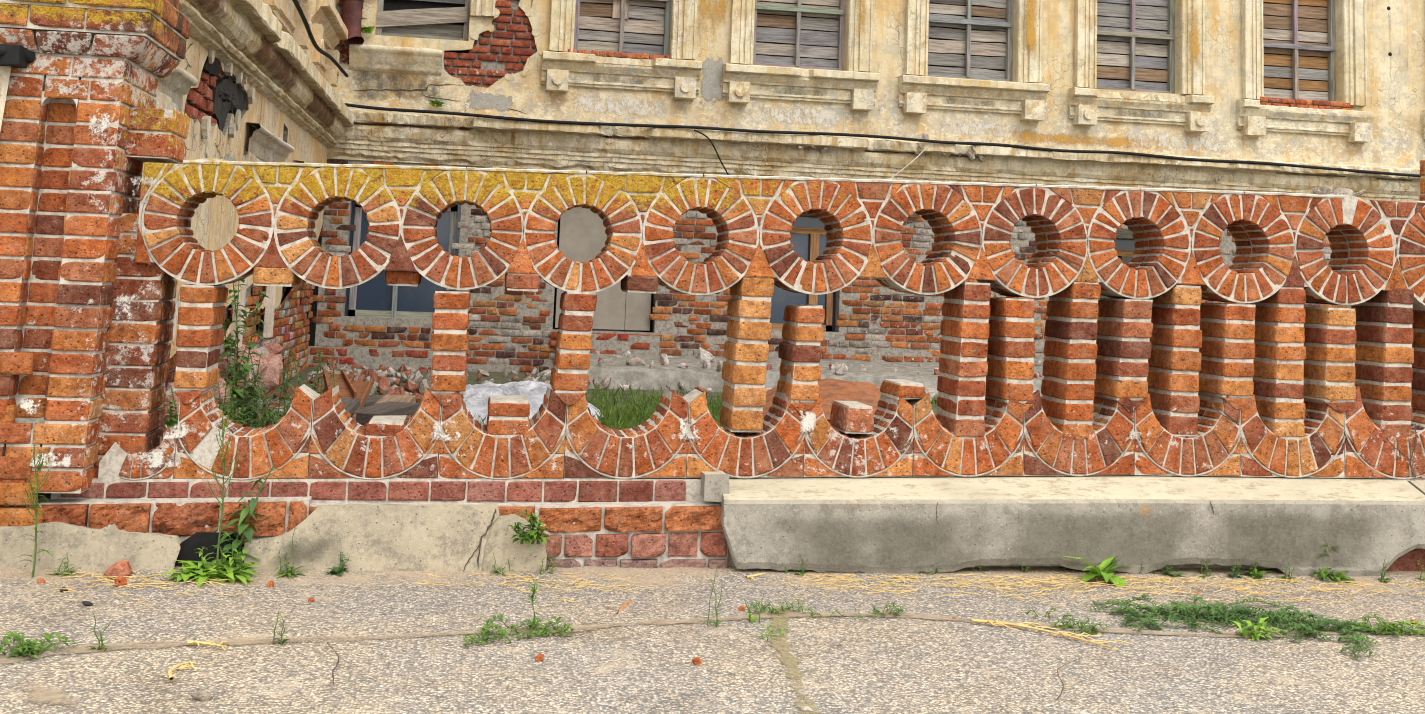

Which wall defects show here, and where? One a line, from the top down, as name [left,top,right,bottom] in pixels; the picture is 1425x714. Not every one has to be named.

flaking render [184,49,255,160]
flaking render [443,0,544,112]
crack [1386,424,1417,481]